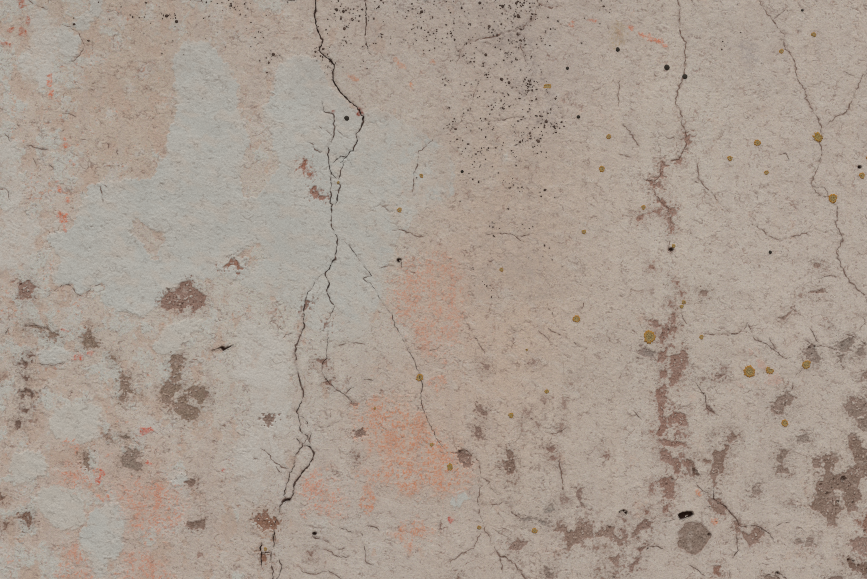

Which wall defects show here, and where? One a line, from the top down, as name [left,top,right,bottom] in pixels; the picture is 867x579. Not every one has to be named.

peeling [0,483,128,579]
peeling [0,318,216,479]
peeling [10,62,442,342]
crack [254,0,402,579]
damp [0,0,666,311]
crack [392,315,442,446]
crack [450,448,526,579]
spalling [449,257,771,579]
spalling [628,126,697,242]
crack [620,0,729,258]
spalling [744,256,867,579]
crack [760,2,866,295]